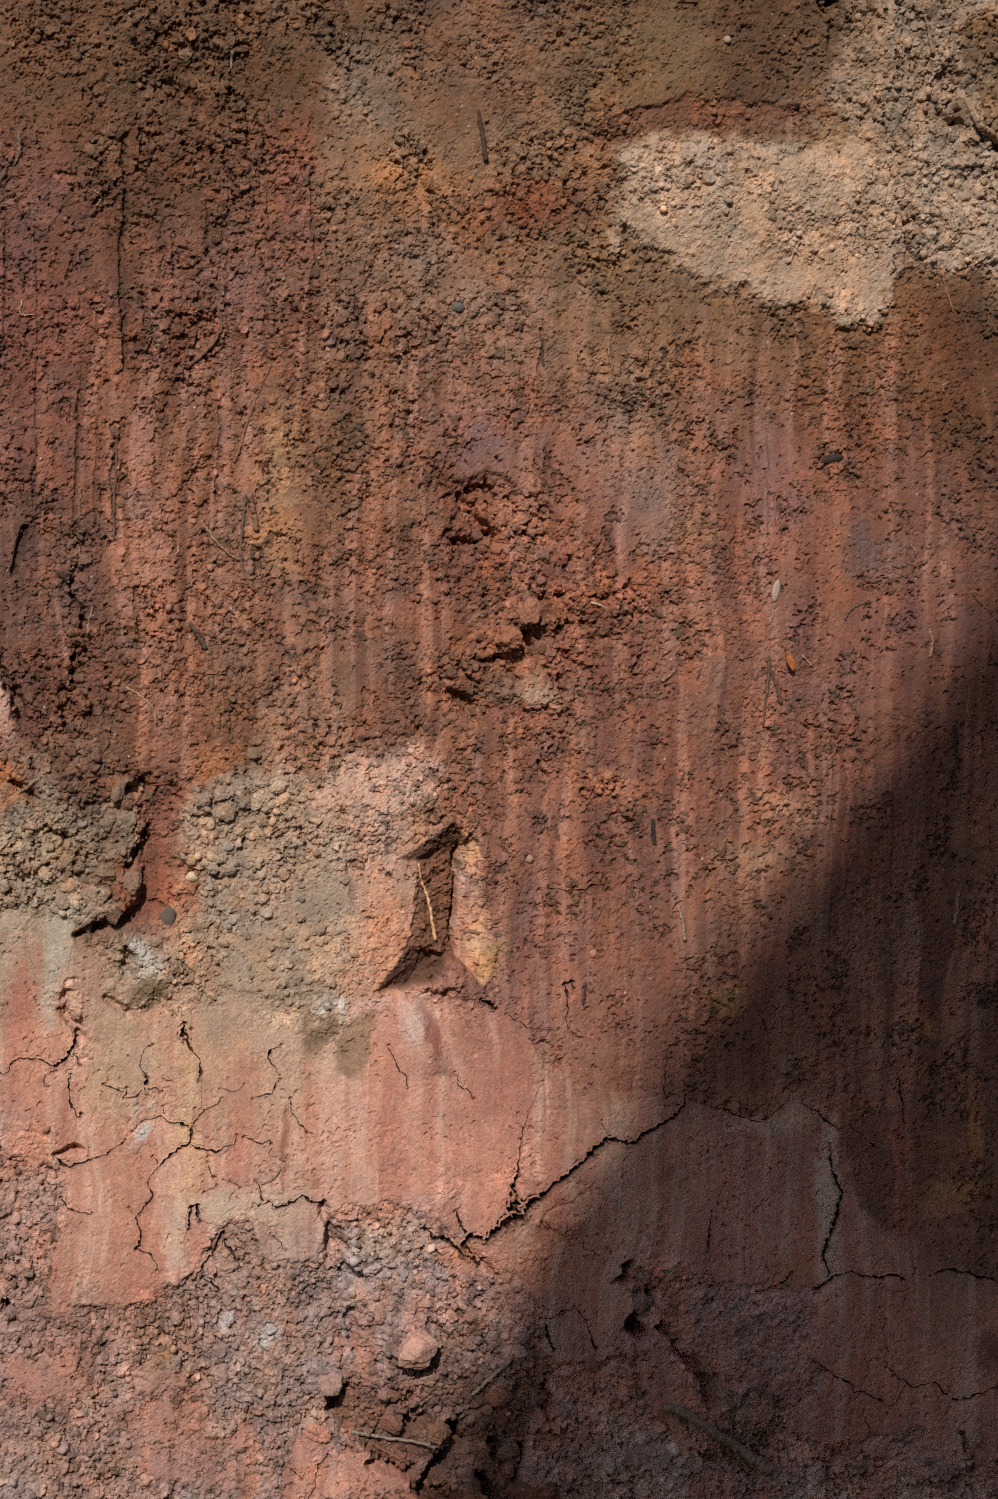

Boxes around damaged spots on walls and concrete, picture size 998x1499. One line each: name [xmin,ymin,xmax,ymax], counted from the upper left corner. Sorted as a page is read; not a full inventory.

spalling [0,745,149,932]
crack [0,1023,322,1291]
spalling [0,1147,340,1499]
crack [426,1046,998,1436]